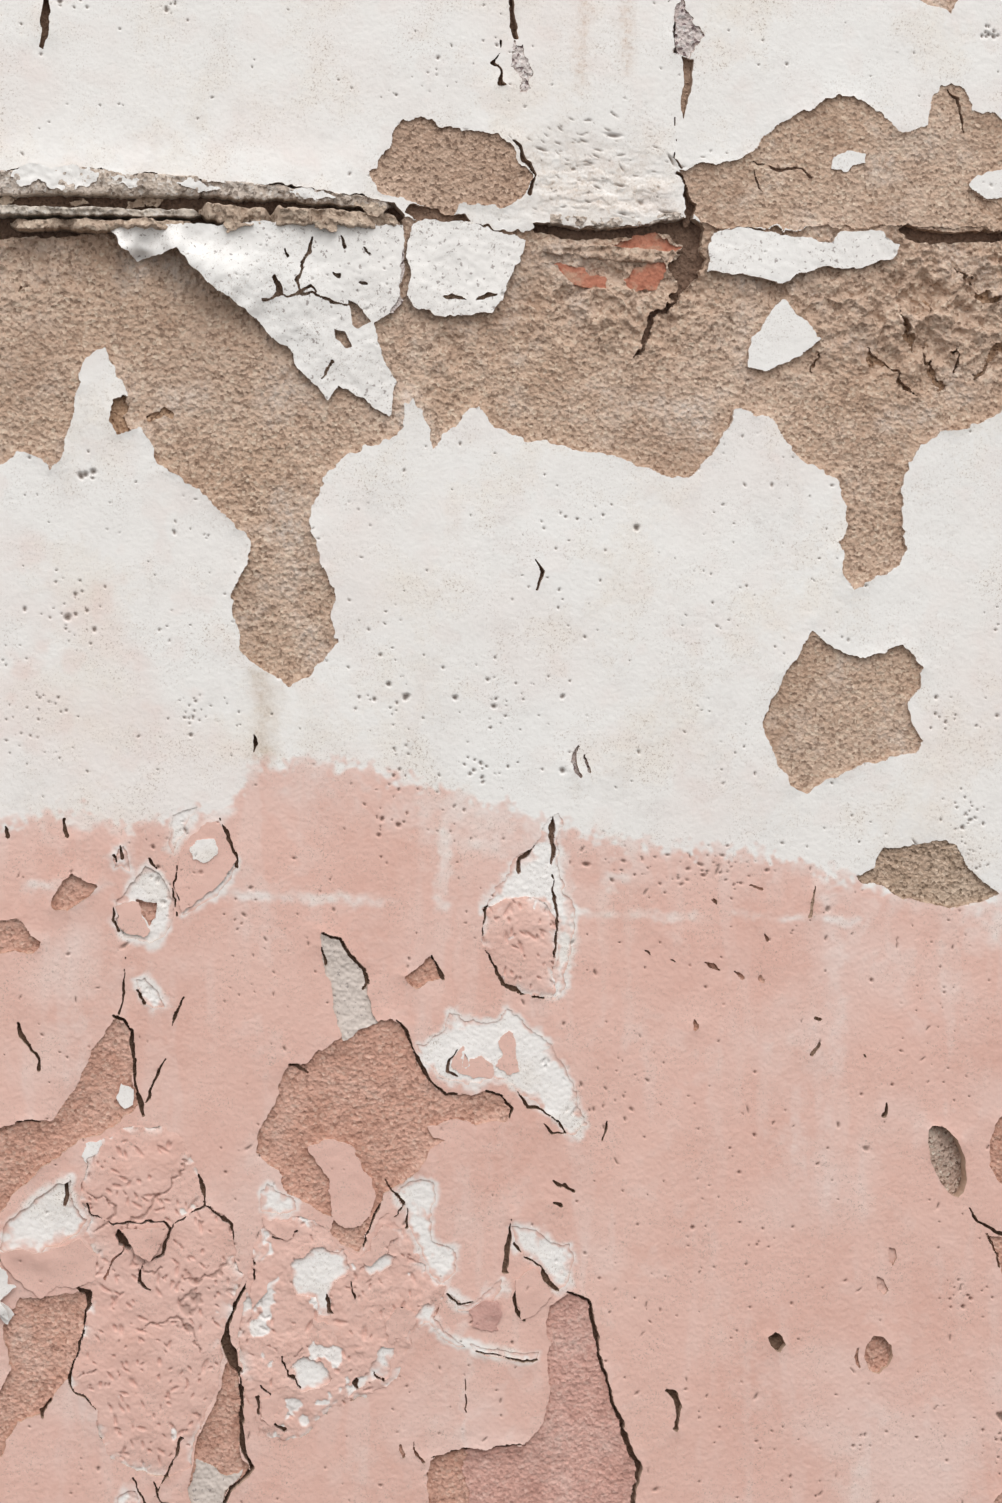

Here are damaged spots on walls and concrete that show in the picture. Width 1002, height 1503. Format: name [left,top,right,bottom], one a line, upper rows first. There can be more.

crack [490,0,533,92]
crack [672,0,704,113]
spalling [921,0,957,12]
crack [515,142,535,196]
spalling [0,84,1002,687]
spalling [763,631,922,793]
spalling [857,840,998,908]
spalling [989,1117,1002,1183]
spalling [0,957,184,1456]
peeling [238,932,641,1503]
peeling [116,1477,163,1503]